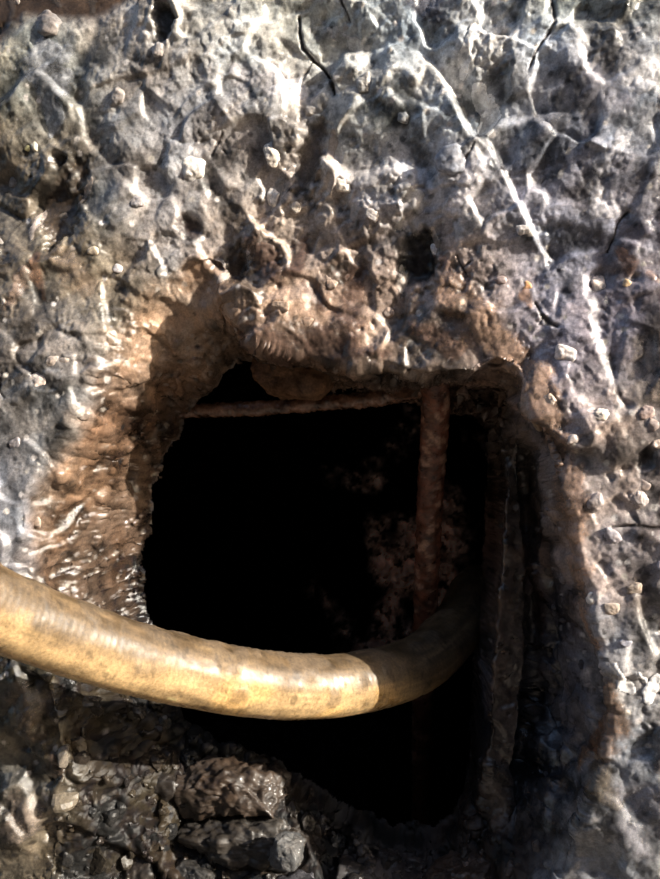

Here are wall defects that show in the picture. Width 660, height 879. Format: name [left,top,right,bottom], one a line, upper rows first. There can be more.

peeling [22,37,74,138]
spalling [157,4,175,41]
crack [297,18,335,95]
crack [530,0,557,67]
spalling [280,124,338,200]
spalling [217,243,253,285]
rust [237,234,391,370]
rust [406,256,600,650]
rust [178,383,451,632]
peeling [612,663,660,706]
rust [411,690,435,827]
rust [578,682,630,811]